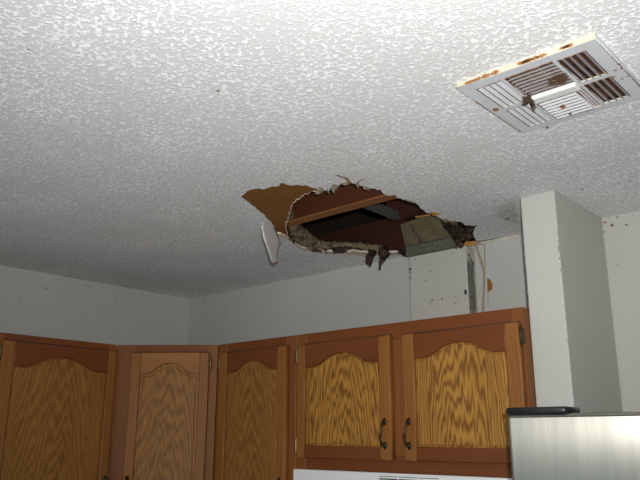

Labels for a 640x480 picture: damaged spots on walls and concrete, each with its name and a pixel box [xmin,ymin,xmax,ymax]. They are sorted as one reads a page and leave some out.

corrosion [465,44,640,132]
peeling [241,183,317,264]
leakage [464,248,476,313]